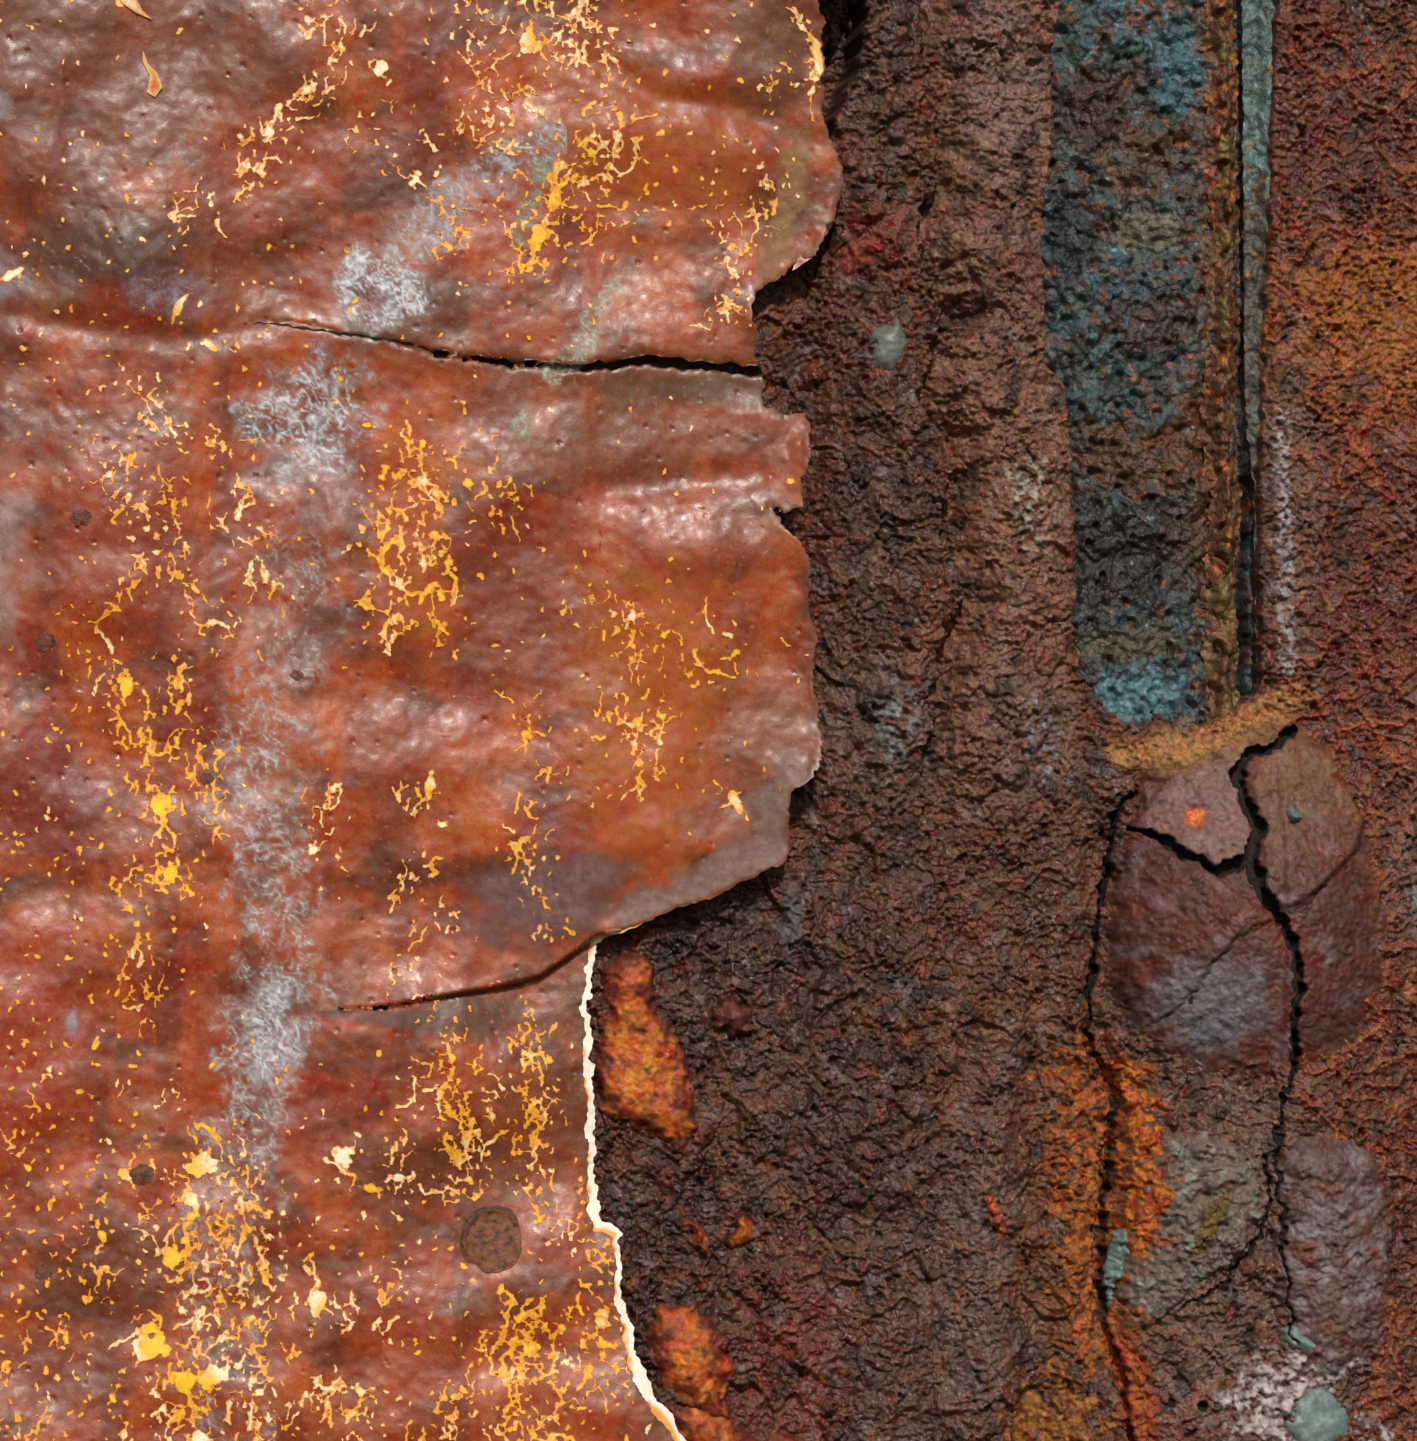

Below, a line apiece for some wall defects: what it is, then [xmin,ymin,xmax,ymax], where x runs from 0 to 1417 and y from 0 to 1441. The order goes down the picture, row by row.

peeling [163,0,800,331]
crack [245,322,763,377]
rust [1311,246,1417,373]
peeling [341,399,545,660]
peeling [29,328,304,1097]
peeling [541,550,758,808]
peeling [0,846,634,1441]
crack [337,1004,387,1012]
rust [588,952,699,1159]
rust [643,1212,801,1441]
rust [997,1034,1185,1441]
crack [1082,725,1351,1441]